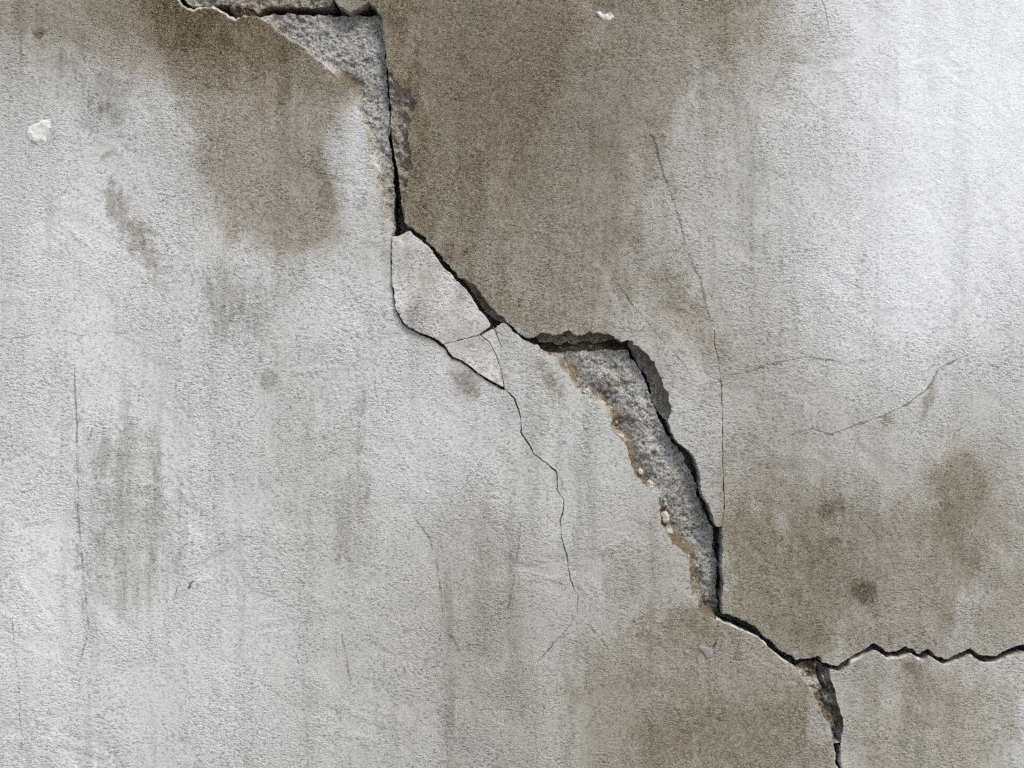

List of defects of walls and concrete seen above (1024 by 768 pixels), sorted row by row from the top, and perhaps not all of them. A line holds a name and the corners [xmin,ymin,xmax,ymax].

crack [178,0,248,21]
spalling [185,0,417,236]
crack [333,0,387,57]
crack [390,143,645,612]
spalling [541,340,718,619]
crack [657,330,1024,673]
crack [833,743,842,768]